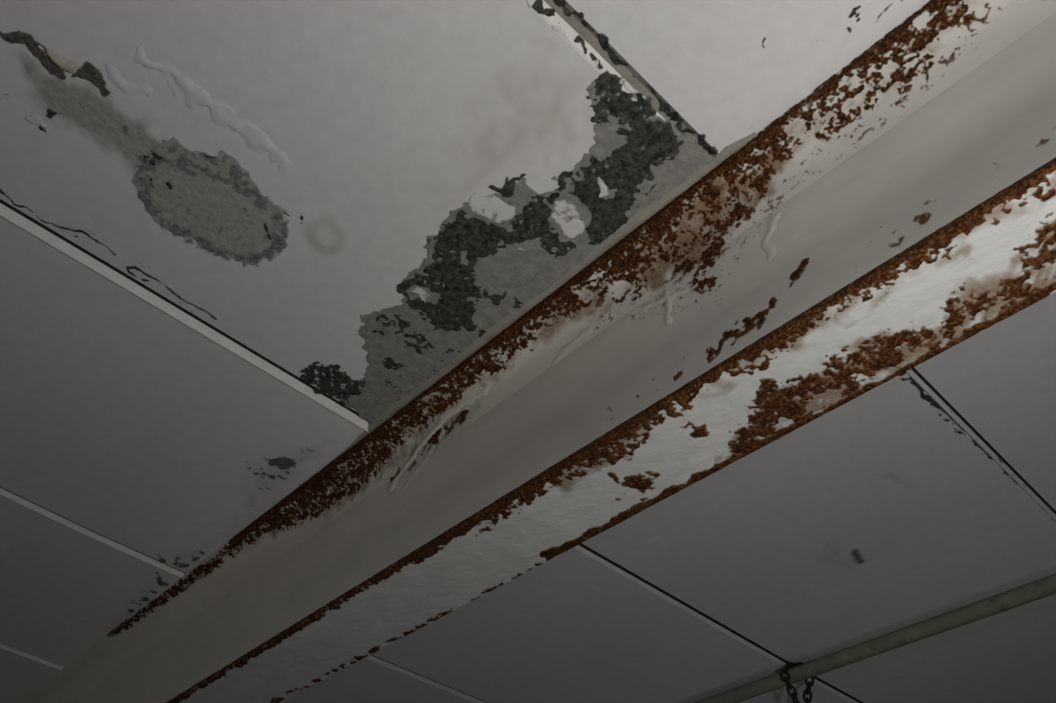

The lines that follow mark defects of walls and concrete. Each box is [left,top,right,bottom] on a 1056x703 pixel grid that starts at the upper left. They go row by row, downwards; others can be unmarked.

peeling [0,31,110,97]
damp [26,64,160,168]
spalling [132,137,289,266]
peeling [300,0,719,425]
corrosion [107,0,991,637]
corrosion [271,609,454,703]